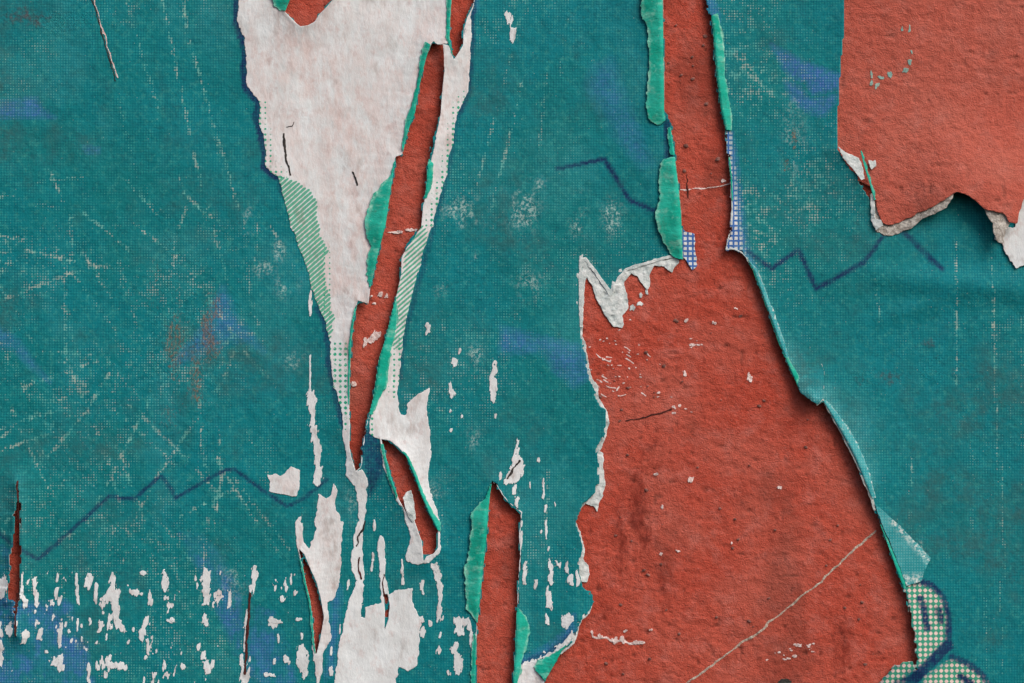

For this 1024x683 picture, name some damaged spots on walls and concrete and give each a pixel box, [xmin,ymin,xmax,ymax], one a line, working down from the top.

peeling [870,50,913,89]
peeling [838,147,883,230]
peeling [995,200,1024,268]
peeling [237,0,473,683]
peeling [489,360,498,419]
peeling [576,254,679,511]
crack [625,408,672,422]
peeling [0,569,186,683]
peeling [194,567,232,627]
crack [686,530,876,683]
peeling [194,643,218,683]